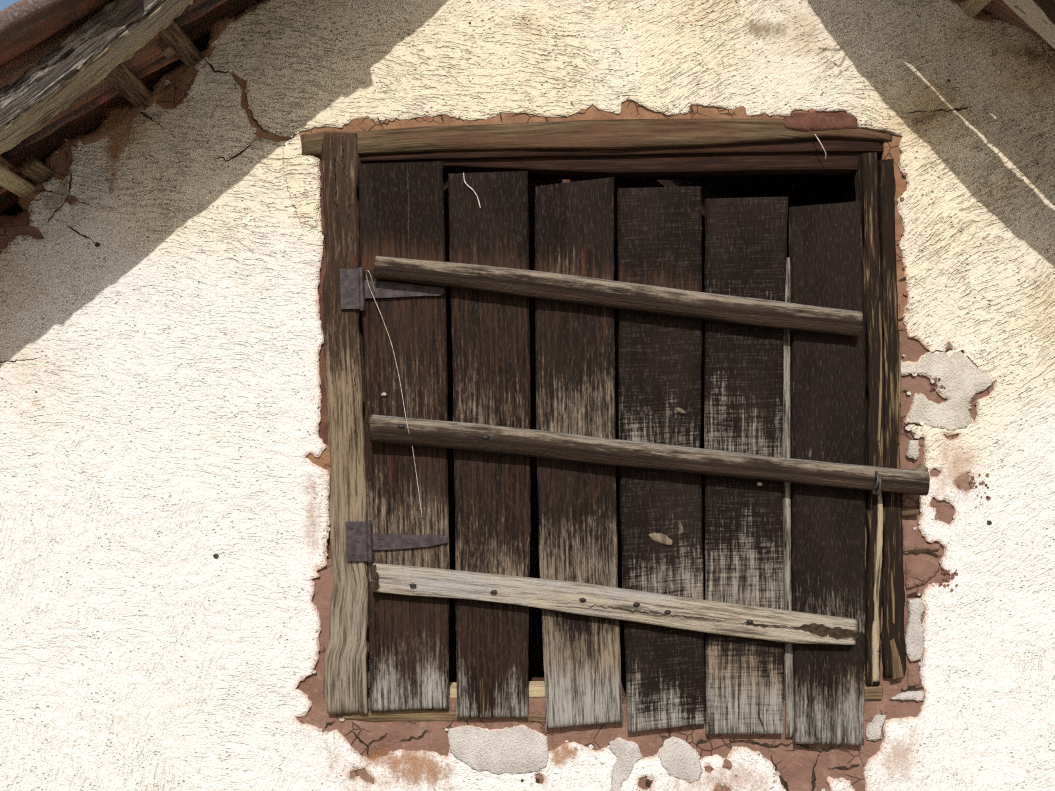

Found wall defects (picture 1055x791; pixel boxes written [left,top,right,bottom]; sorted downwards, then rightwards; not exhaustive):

flaking render [0,0,269,255]
crack [204,58,297,162]
flaking render [298,99,847,139]
flaking render [968,383,993,421]
flaking render [954,470,991,500]
flaking render [901,493,958,634]
flaking render [296,520,926,791]